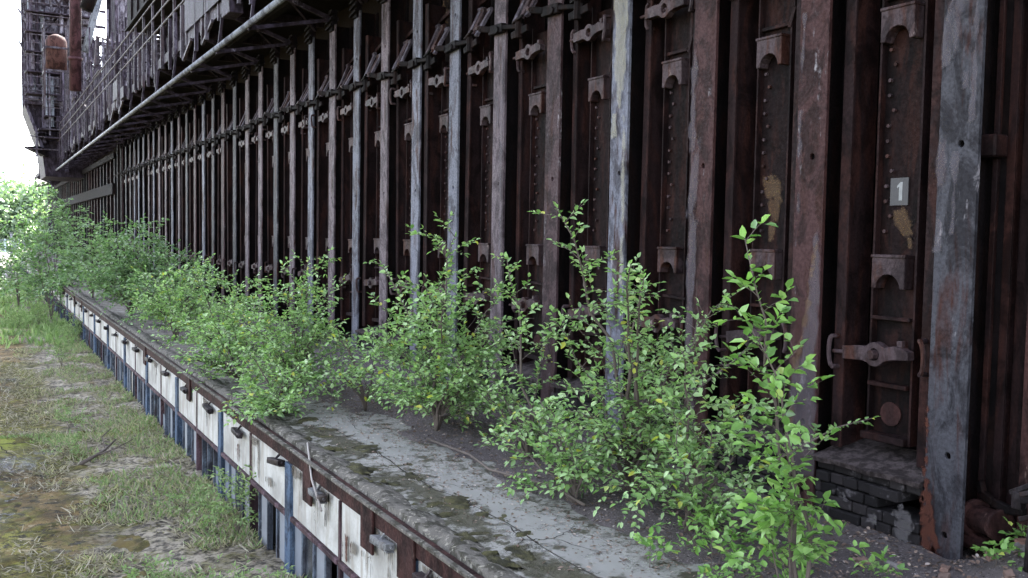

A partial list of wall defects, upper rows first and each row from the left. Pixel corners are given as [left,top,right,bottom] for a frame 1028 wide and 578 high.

corrosion [919,407,940,556]